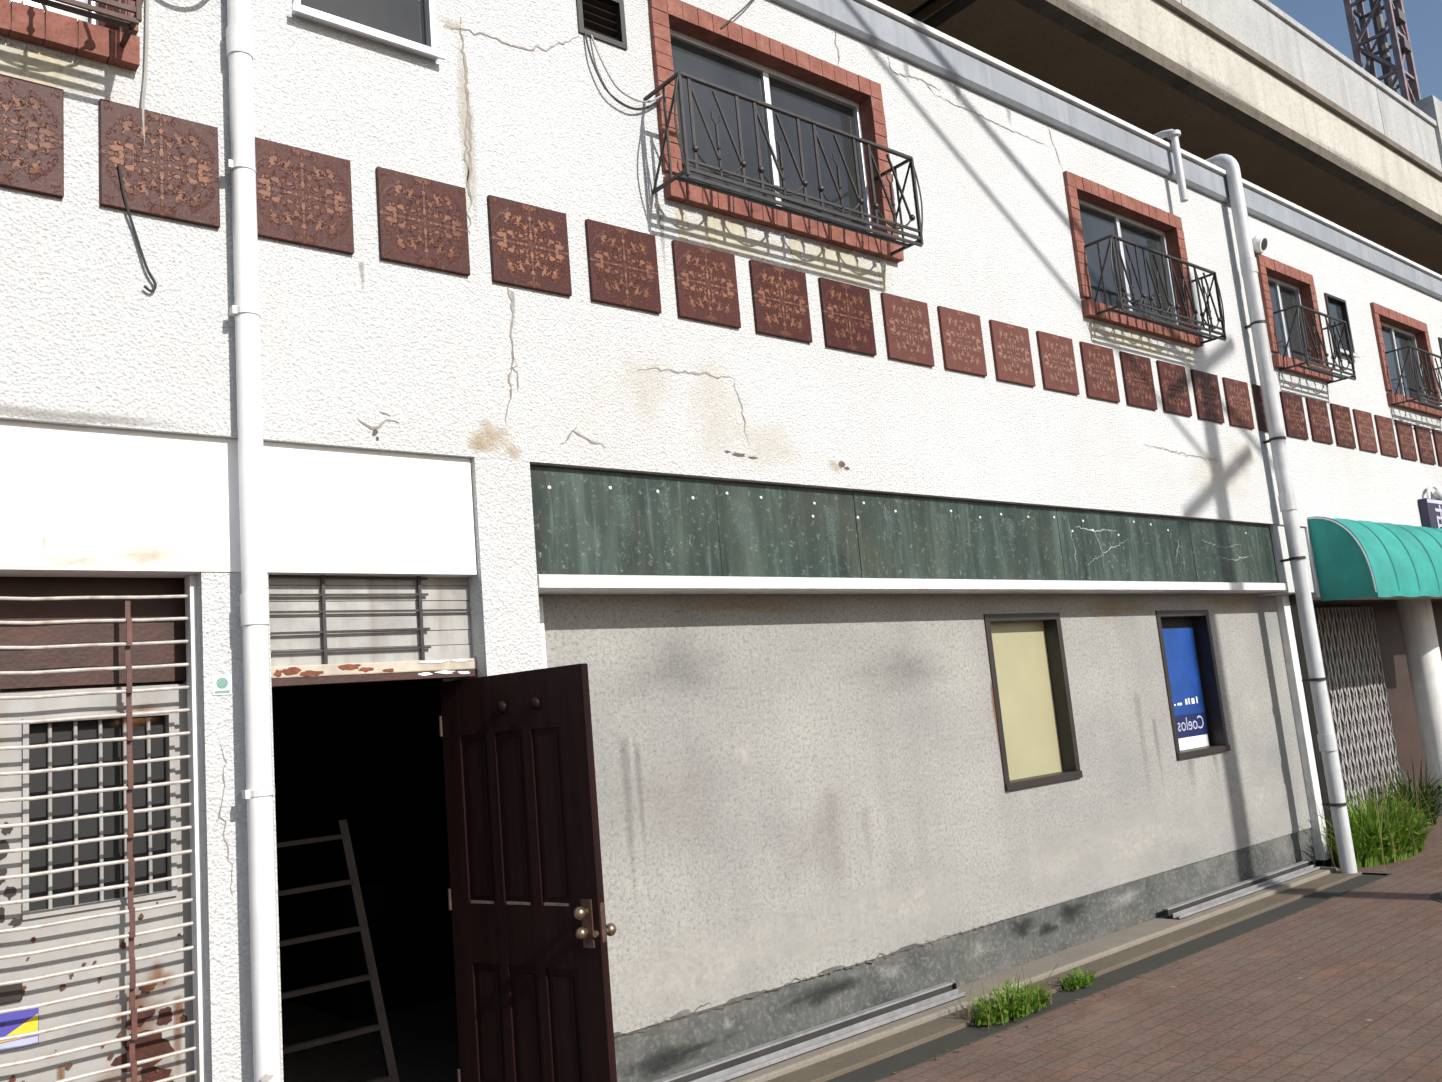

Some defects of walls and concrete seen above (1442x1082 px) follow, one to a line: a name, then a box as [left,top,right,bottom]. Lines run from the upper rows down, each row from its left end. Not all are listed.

crack [443,24,578,234]
crack [505,290,519,423]
rust [274,664,394,677]
rust [101,968,187,1082]
damp [652,1043,709,1072]
damp [808,981,851,1002]